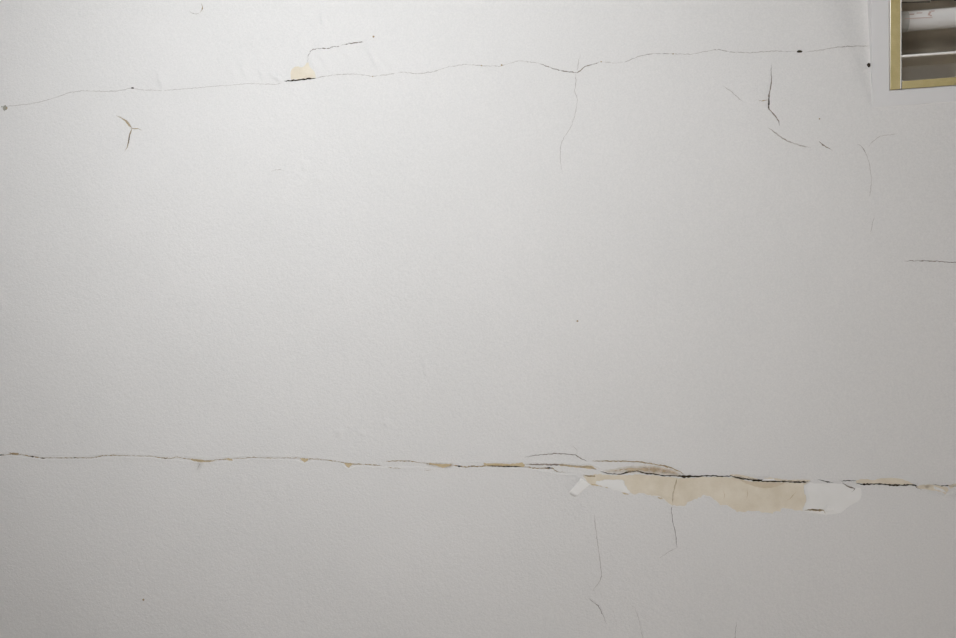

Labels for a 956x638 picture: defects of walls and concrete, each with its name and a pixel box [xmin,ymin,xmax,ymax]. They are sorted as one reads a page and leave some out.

crack [7,46,864,169]
crack [0,446,956,501]
peeling [569,474,862,518]